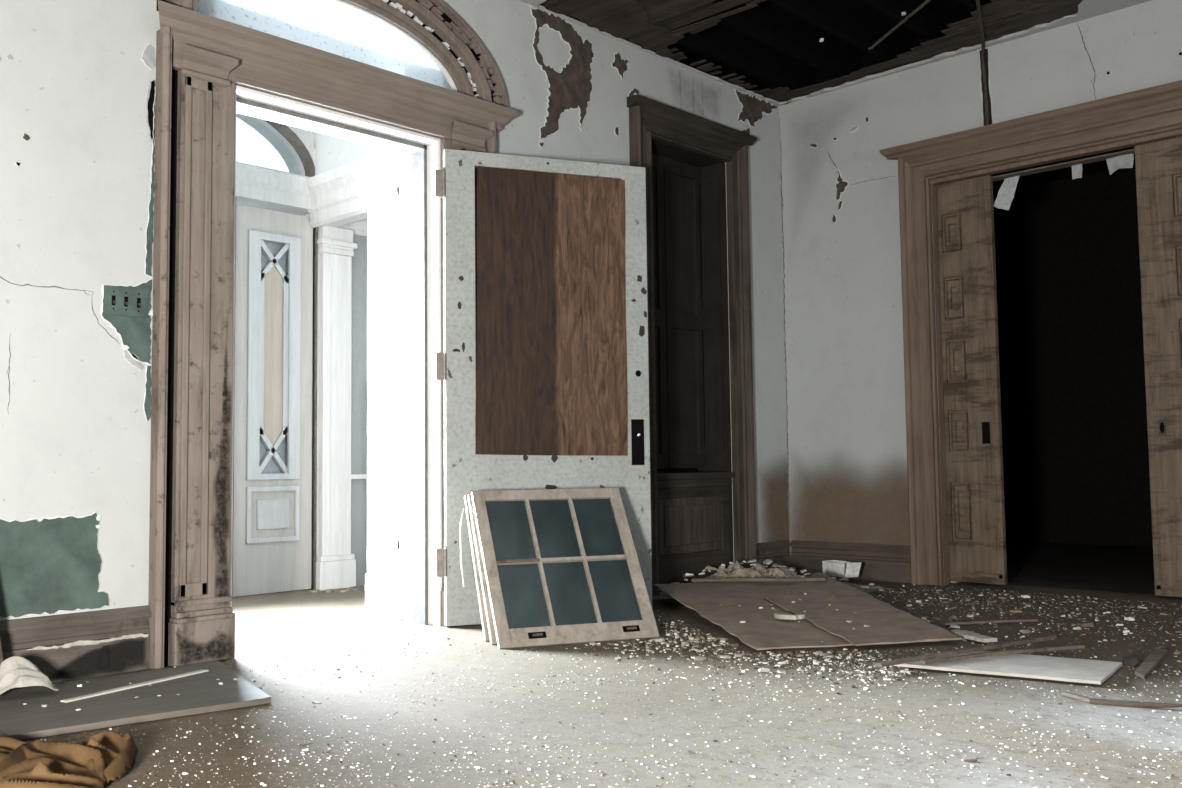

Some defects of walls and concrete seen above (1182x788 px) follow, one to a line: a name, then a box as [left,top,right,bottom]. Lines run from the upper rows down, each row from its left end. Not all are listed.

spalling [528,0,1083,165]
crack [0,276,119,343]
peeling [100,80,156,422]
peeling [0,511,110,619]